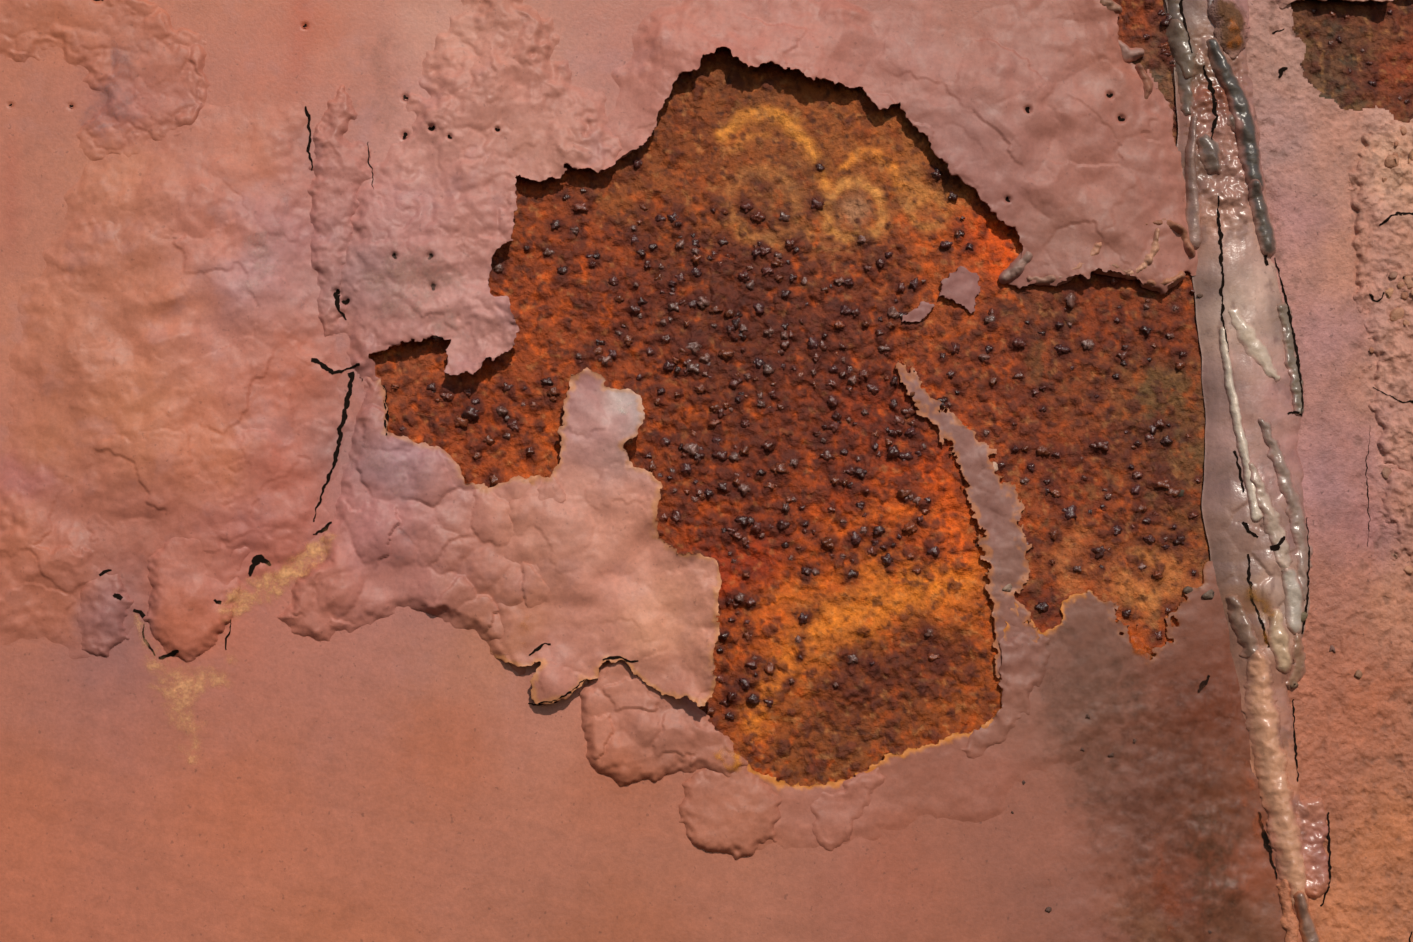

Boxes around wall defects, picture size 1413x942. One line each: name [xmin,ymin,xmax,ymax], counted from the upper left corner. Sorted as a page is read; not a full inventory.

corrosion [1113,0,1178,147]
corrosion [1290,0,1413,123]
crack [305,106,313,171]
crack [1379,212,1413,226]
crack [333,295,347,320]
peeling [277,0,1198,707]
crack [1369,276,1405,302]
crack [311,358,389,535]
corrosion [360,47,1211,787]
crack [214,599,231,650]
crack [248,554,271,576]
peeling [747,360,1243,850]